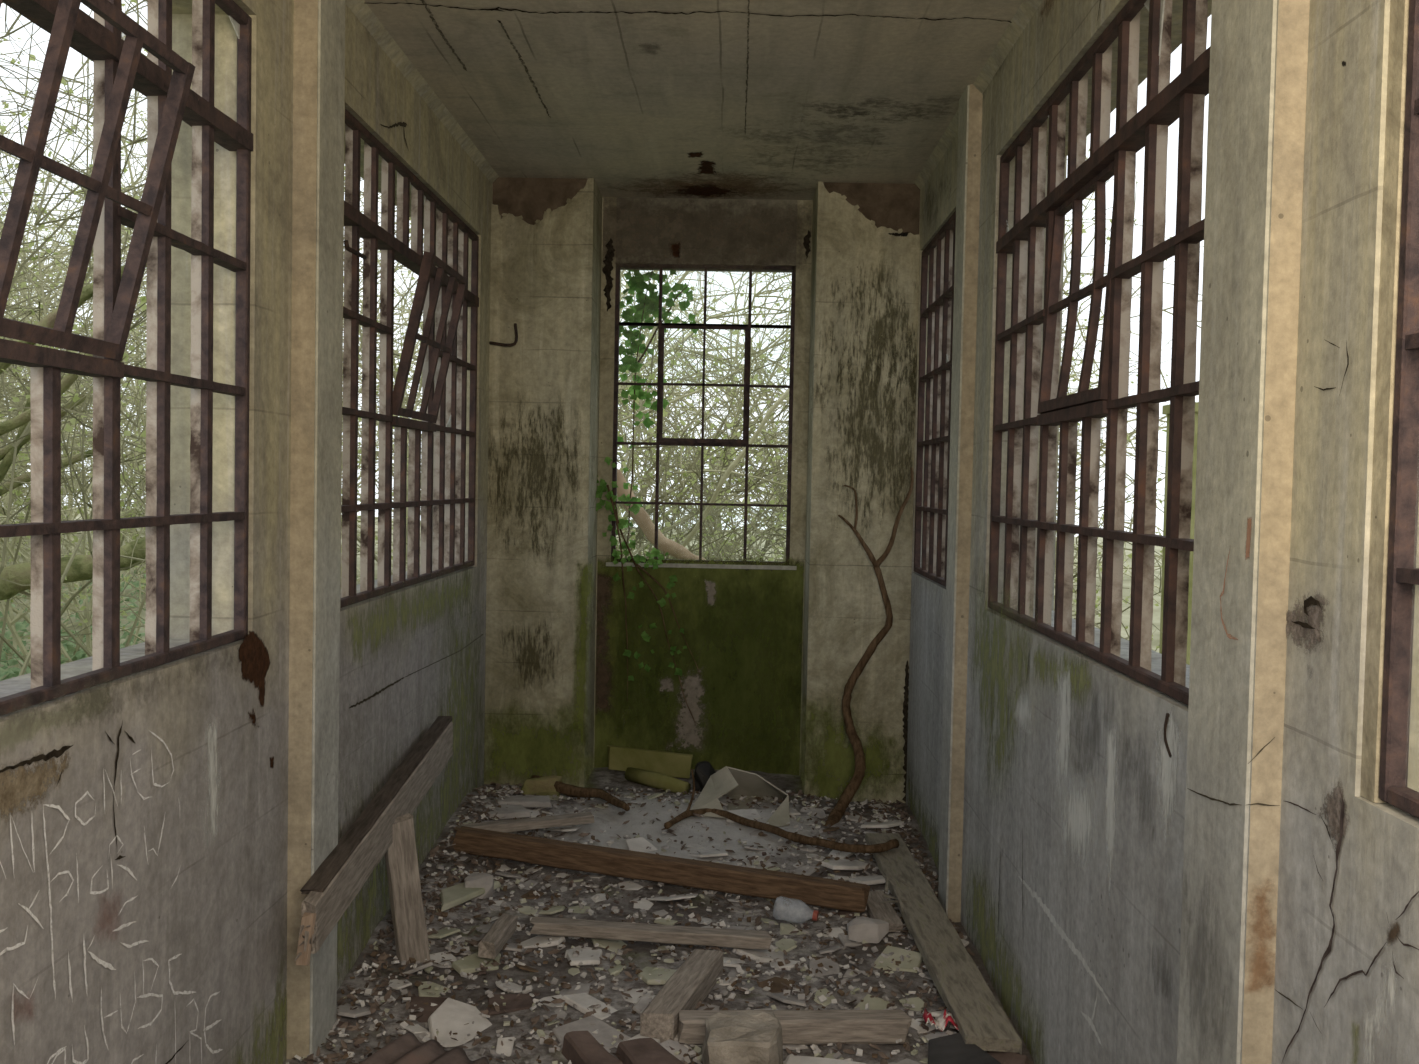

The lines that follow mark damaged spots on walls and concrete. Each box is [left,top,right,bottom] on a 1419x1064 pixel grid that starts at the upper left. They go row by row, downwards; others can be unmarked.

crack [369,0,1012,133]
flaking render [492,177,588,225]
flaking render [823,182,920,237]
leakage [487,407,577,556]
rust [239,631,270,727]
leakage [504,623,554,686]
leakage [595,574,612,713]
spalling [1286,595,1325,650]
spalling [0,745,73,817]
leakage [1057,672,1116,892]
leakage [1143,712,1179,831]
crack [1187,788,1419,1064]